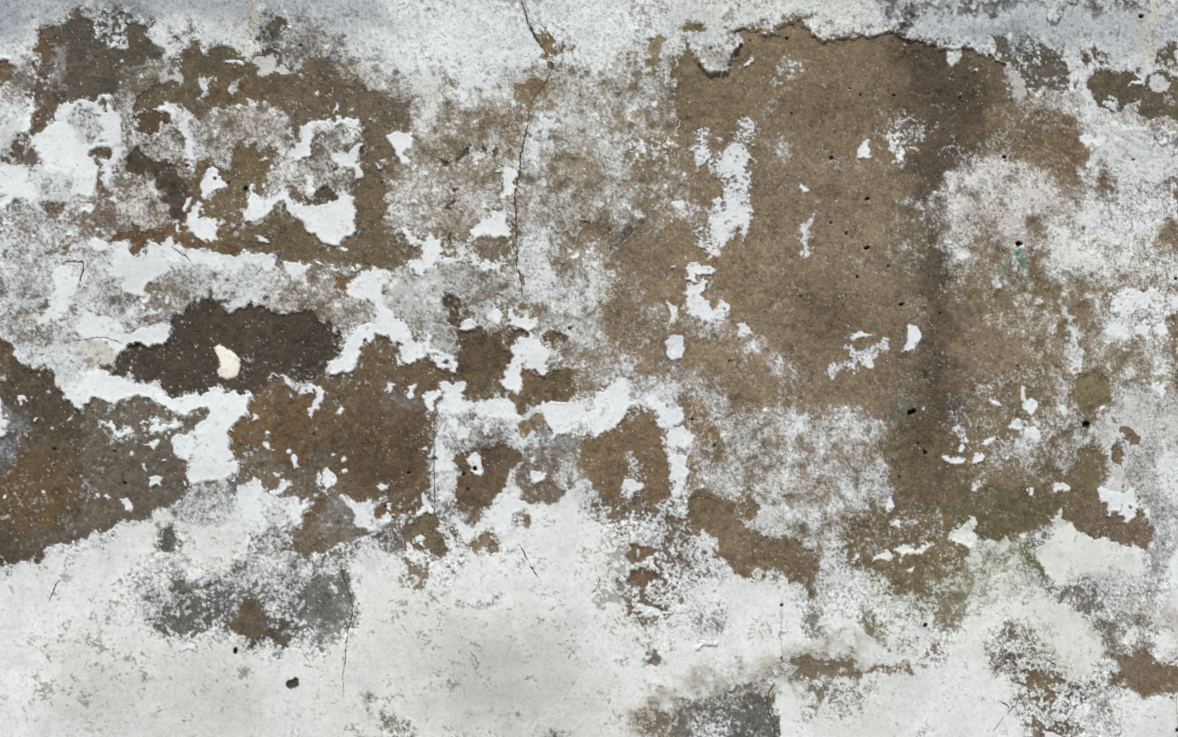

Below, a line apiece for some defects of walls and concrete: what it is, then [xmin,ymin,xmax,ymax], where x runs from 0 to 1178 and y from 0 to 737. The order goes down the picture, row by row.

spalling [0,338,210,567]
spalling [99,290,577,650]
spalling [0,6,683,400]
crack [514,0,553,294]
spalling [573,14,1178,638]
peeling [636,609,946,737]
peeling [991,612,1178,737]